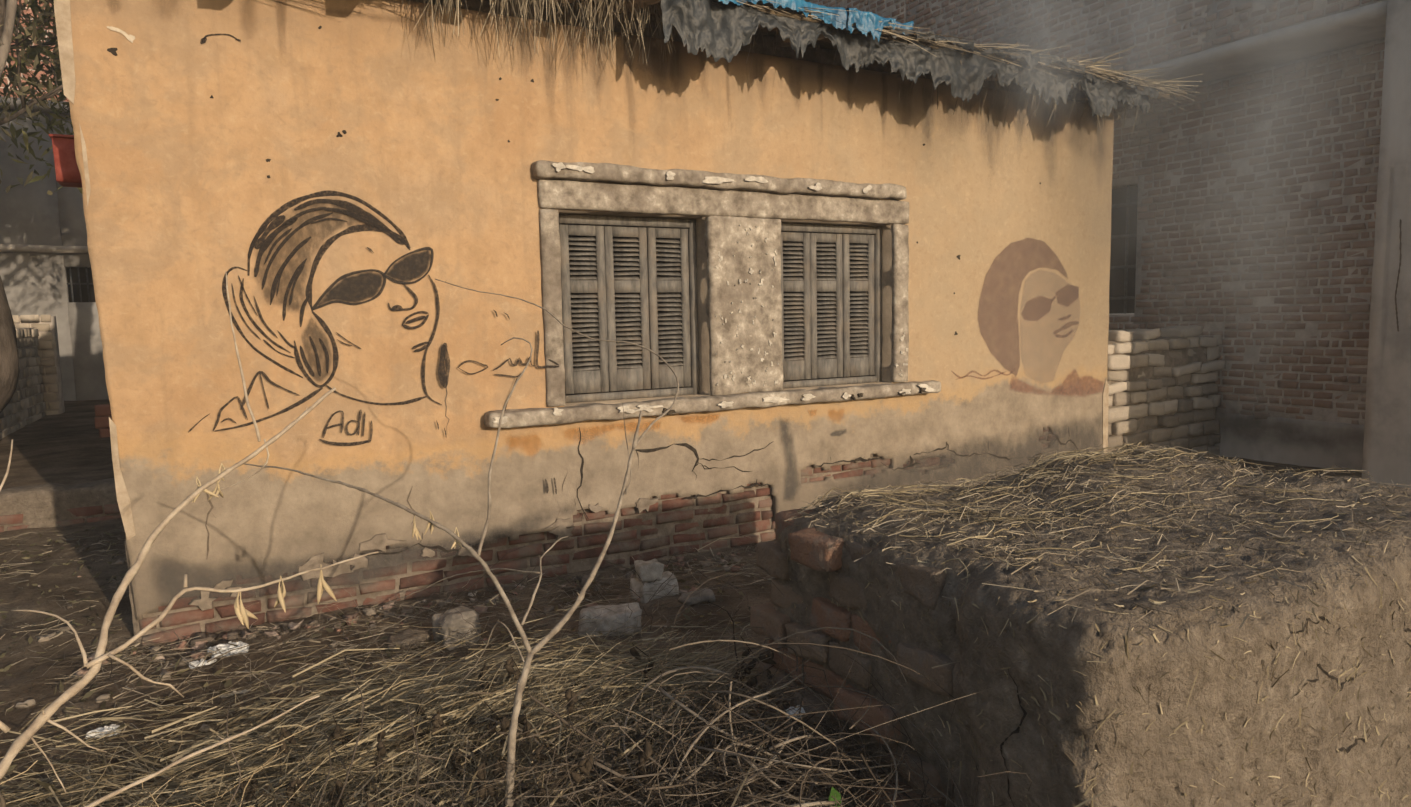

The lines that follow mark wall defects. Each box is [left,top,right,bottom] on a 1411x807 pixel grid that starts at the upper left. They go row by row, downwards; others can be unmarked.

flaking render [54,0,76,104]
spalling [551,162,595,174]
spalling [702,176,768,184]
spalling [894,332,935,396]
spalling [617,404,676,415]
crack [557,427,588,518]
crack [635,441,774,499]
spalling [109,417,776,645]
crack [1287,616,1331,641]
crack [1293,656,1367,697]
crack [1000,668,1027,806]
crack [1336,729,1374,753]